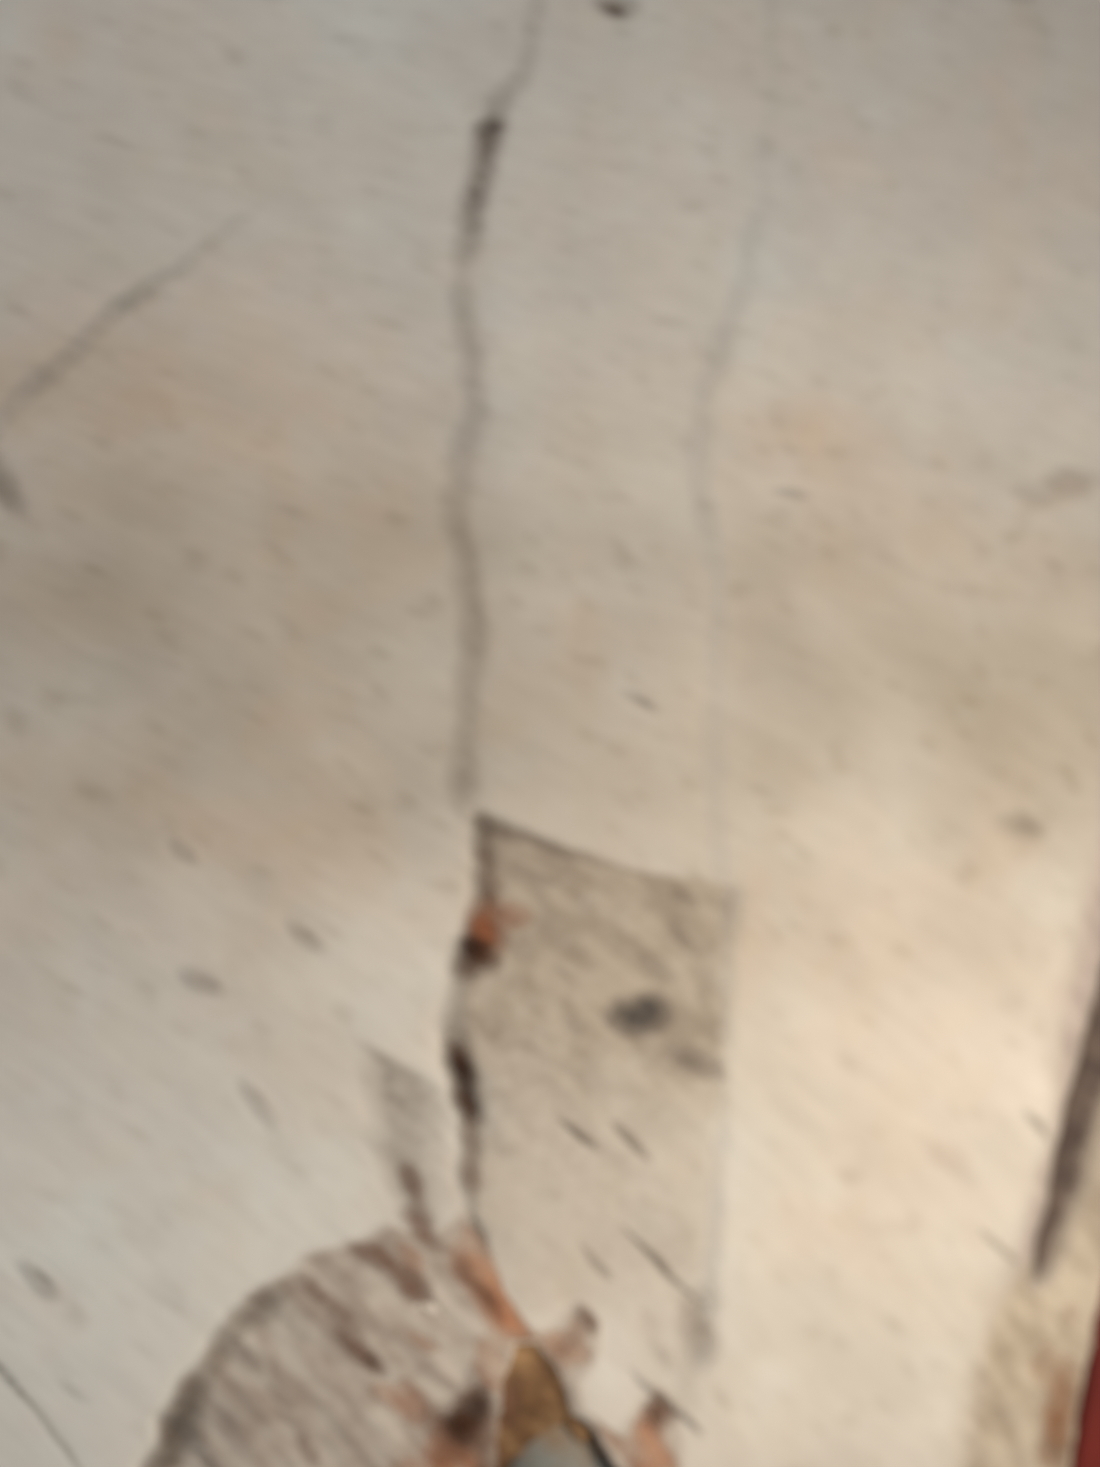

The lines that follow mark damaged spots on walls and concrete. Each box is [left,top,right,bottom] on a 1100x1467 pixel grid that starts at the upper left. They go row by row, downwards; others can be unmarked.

crack [0,200,269,453]
crack [434,109,516,826]
corrosion [462,912,507,970]
spalling [137,809,743,1467]
spalling [9,1250,73,1306]
crack [0,1359,86,1467]